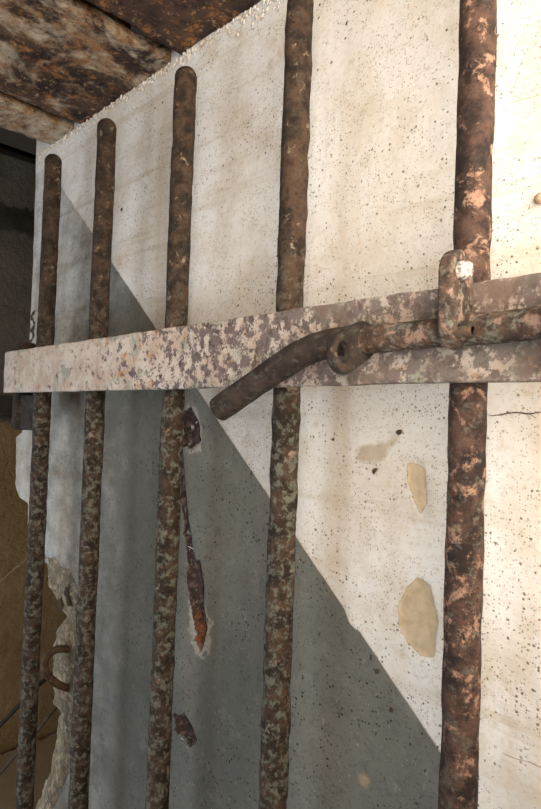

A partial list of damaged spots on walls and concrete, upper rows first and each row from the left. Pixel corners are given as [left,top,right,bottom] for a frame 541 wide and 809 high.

peeling [36,0,280,161]
spalling [36,557,78,809]